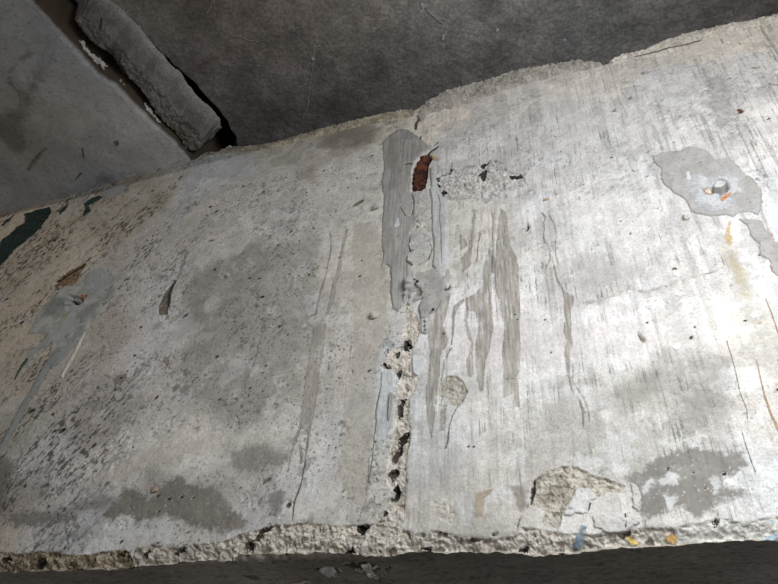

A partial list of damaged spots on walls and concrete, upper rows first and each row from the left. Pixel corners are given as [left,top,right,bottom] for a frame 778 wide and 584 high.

spalling [200,14,778,156]
rust [404,142,439,192]
spalling [400,160,528,266]
water stain [103,478,247,532]
spalling [0,466,778,580]
spalling [389,431,411,501]
water stain [626,447,747,519]